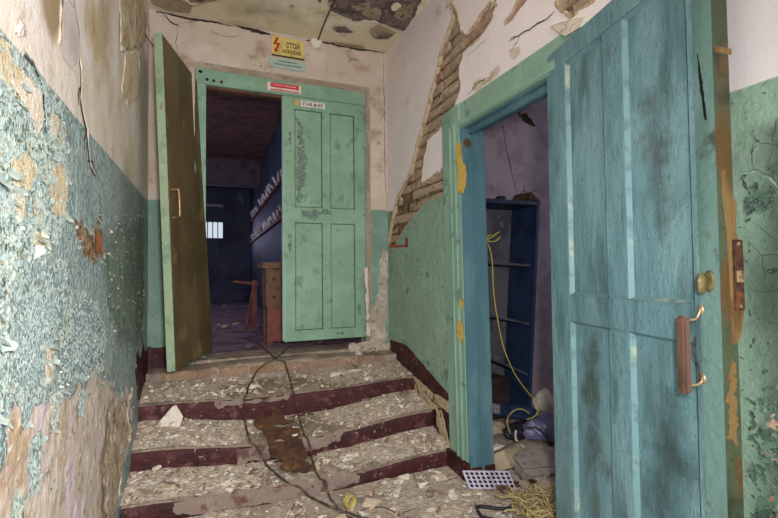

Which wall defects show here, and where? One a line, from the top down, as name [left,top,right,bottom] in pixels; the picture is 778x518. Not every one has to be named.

crack [58,0,80,46]
peeling [62,3,78,69]
peeling [318,0,424,49]
crack [509,11,555,50]
spalling [555,0,595,20]
crack [76,59,100,215]
spalling [348,1,500,352]
crack [743,118,778,187]
peeling [0,30,145,518]
peeling [726,360,778,518]